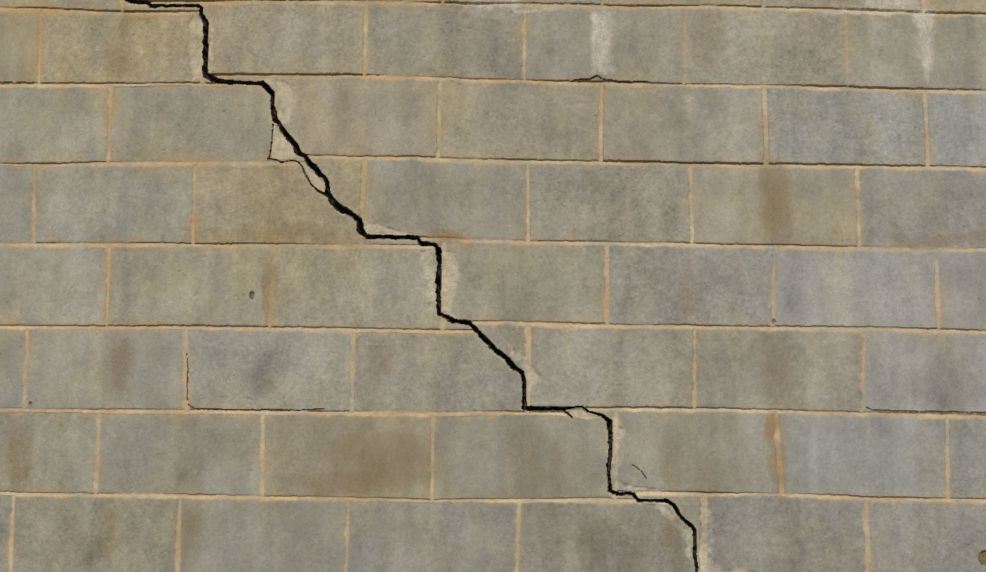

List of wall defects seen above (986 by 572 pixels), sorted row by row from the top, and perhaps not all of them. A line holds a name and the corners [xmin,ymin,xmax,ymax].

crack [125,0,699,572]